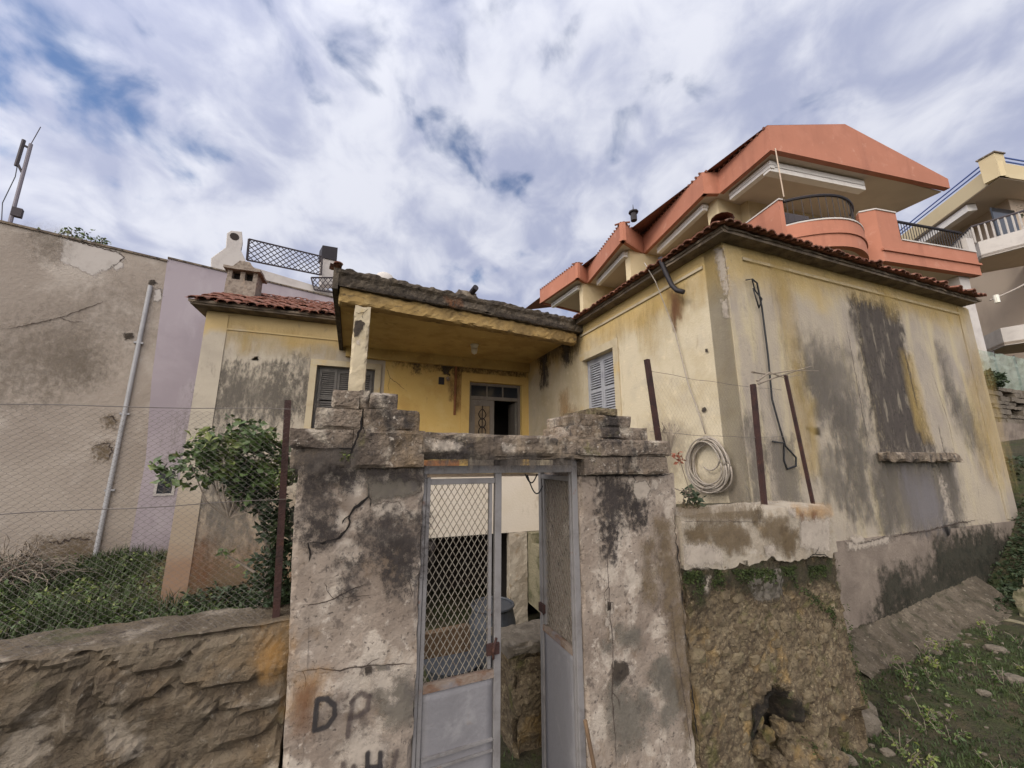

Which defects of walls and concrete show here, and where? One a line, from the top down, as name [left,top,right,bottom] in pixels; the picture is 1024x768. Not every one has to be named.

crack [3,300,107,329]
leakage [539,336,579,389]
leakage [216,356,308,425]
spalling [92,442,114,462]
leakage [795,292,1010,625]
crack [307,478,372,561]
peeling [789,508,830,553]
leakage [593,418,801,749]
peeling [684,543,722,593]
spalling [749,568,784,601]
crack [295,658,415,690]
spalling [750,687,810,746]